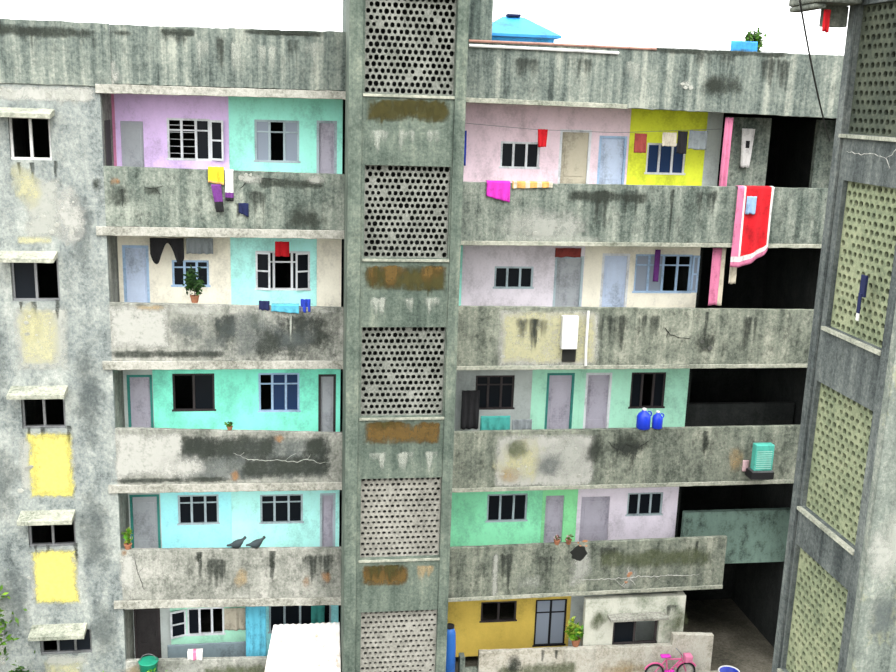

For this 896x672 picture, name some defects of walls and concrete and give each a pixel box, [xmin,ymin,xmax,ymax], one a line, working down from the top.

rust [369,99,449,123]
rust [365,265,444,291]
damp [216,310,334,358]
rust [366,422,439,443]
crack [234,453,324,463]
damp [196,552,225,581]
damp [305,555,330,577]
rust [363,565,407,585]